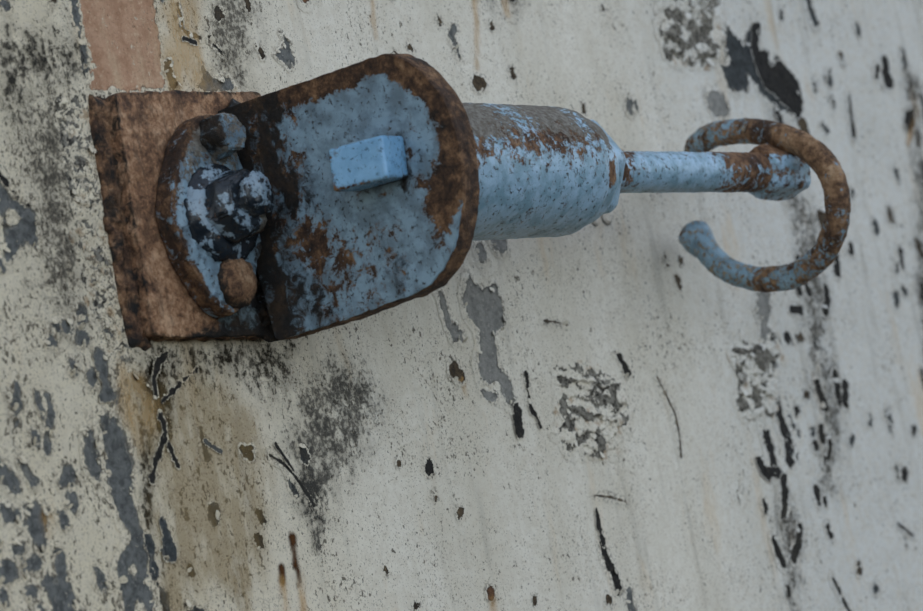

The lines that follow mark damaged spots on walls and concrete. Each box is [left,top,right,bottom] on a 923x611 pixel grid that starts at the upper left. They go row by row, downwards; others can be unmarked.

peeling [211,0,254,29]
peeling [702,13,859,144]
peeling [814,203,825,231]
peeling [0,0,243,611]
peeling [433,239,525,439]
peeling [751,239,856,602]
peeling [236,439,258,465]
peeling [250,504,270,553]
corrosion [279,533,301,585]